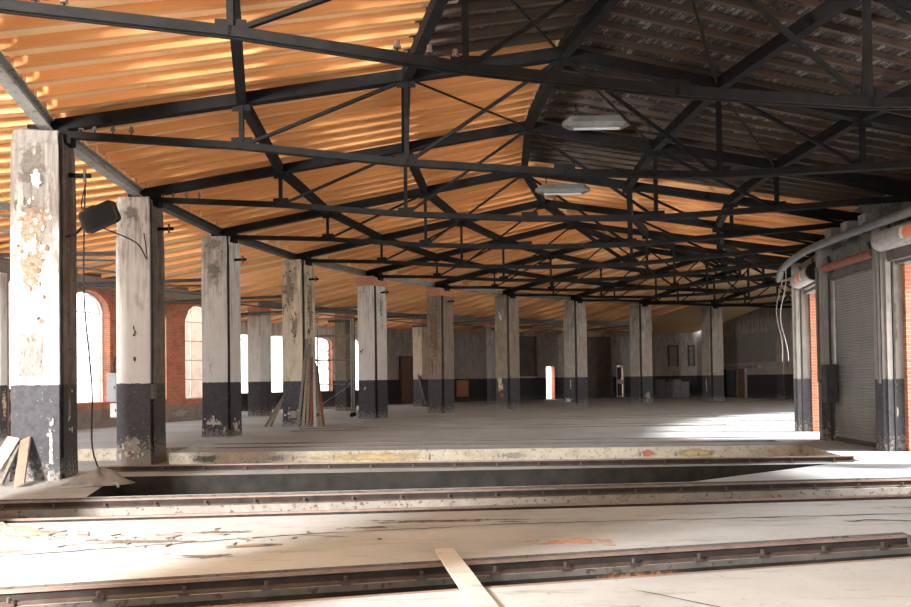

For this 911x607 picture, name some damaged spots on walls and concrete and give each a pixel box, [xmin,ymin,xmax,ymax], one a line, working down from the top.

peeling [14,169,53,304]
flaking render [18,316,44,379]
peeling [119,431,149,462]
spalling [203,416,240,432]